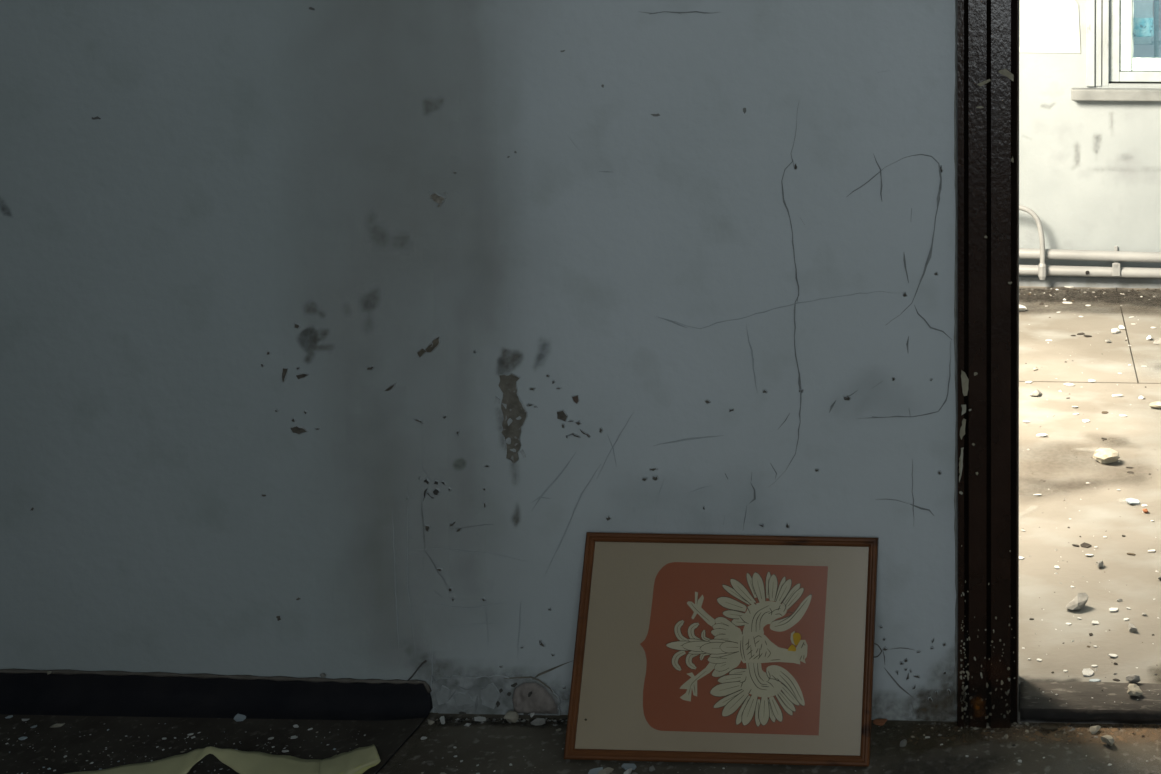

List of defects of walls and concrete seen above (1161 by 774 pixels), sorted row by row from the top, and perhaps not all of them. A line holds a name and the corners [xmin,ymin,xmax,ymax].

crack [649,103,952,487]
peeling [494,350,538,464]
peeling [546,374,603,438]
crack [887,462,933,516]